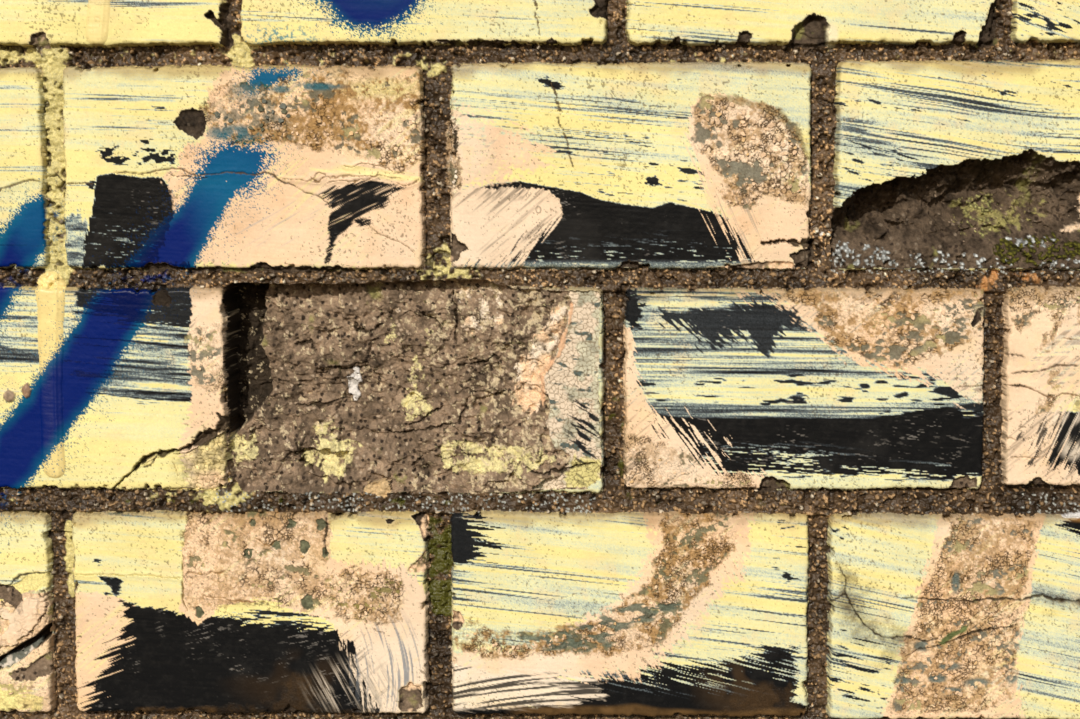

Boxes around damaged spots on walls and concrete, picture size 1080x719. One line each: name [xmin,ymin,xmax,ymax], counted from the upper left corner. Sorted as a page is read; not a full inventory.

peeling [173,64,464,190]
peeling [688,92,811,216]
spalling [708,237,815,270]
spalling [781,149,1080,419]
crack [115,413,245,492]
spalling [141,262,603,627]
peeling [616,432,791,495]
peeling [448,509,739,663]
crack [831,560,1080,670]
peeling [885,510,1046,717]